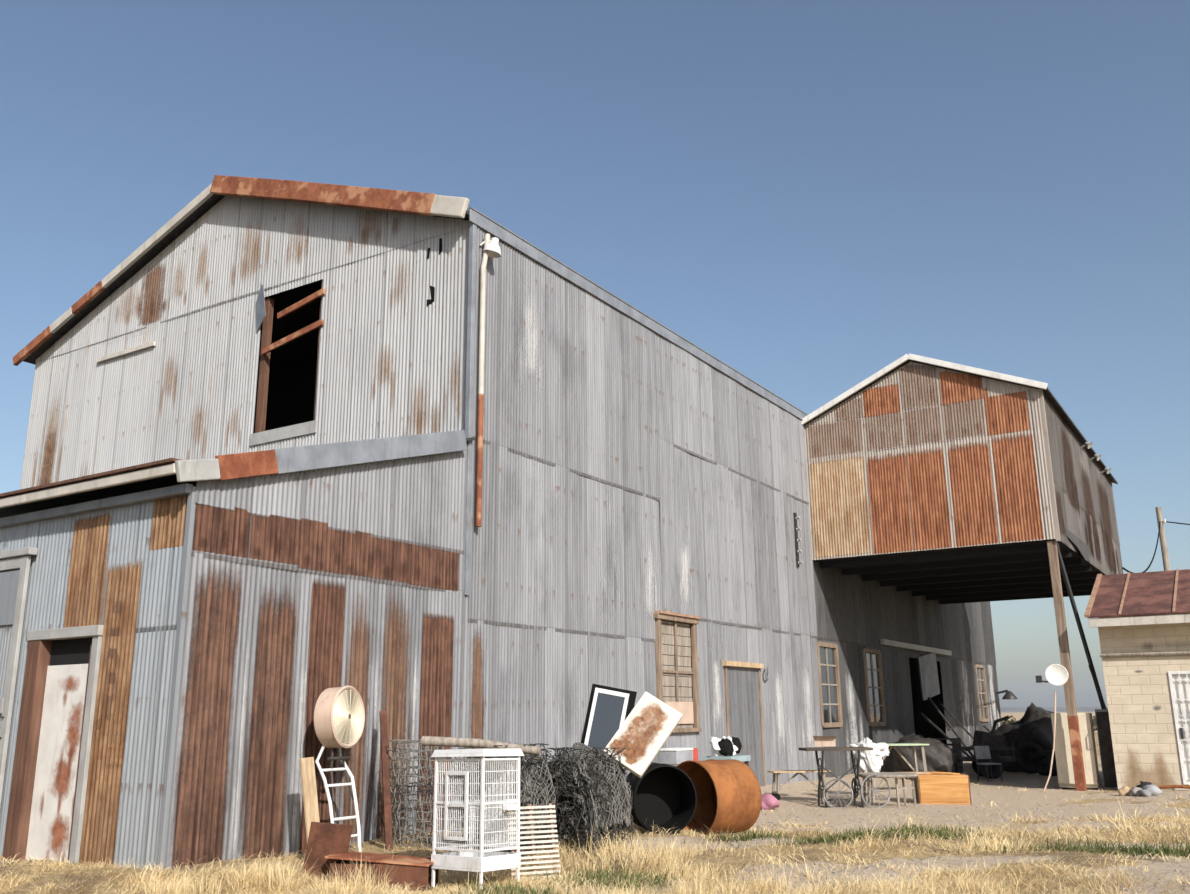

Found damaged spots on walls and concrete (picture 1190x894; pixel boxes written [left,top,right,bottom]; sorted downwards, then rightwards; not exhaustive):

corrosion [126,266,182,325]
corrosion [809,365,1044,558]
corrosion [1056,433,1119,571]
corrosion [46,513,142,867]
corrosion [149,495,459,868]
corrosion [472,631,484,758]